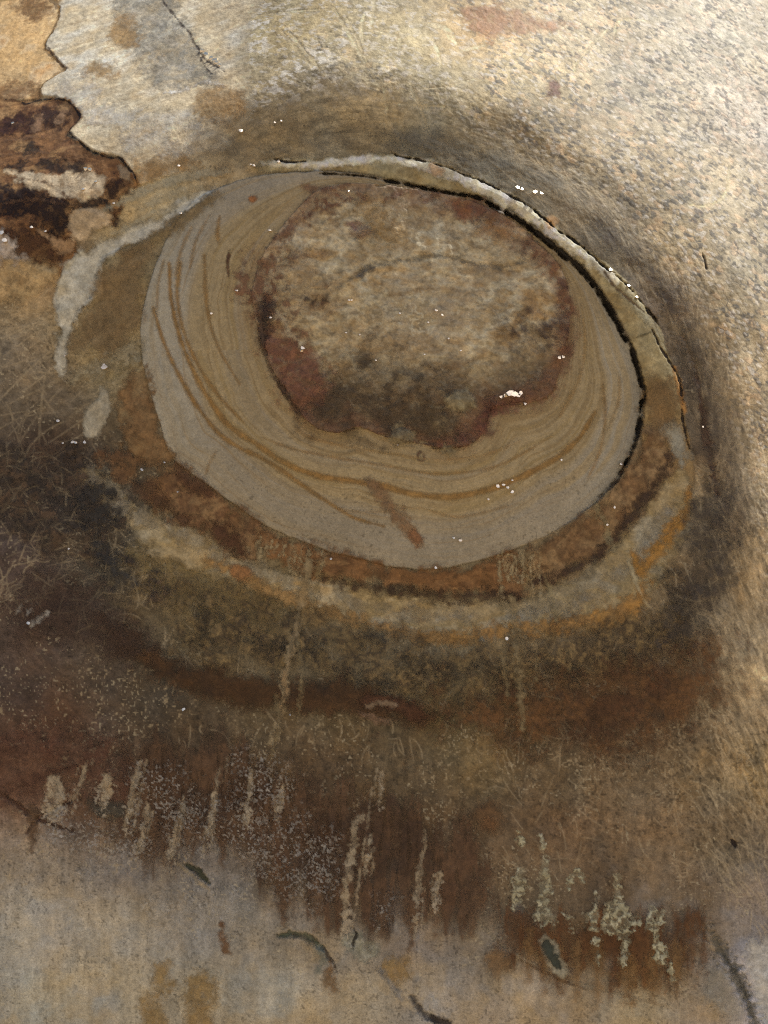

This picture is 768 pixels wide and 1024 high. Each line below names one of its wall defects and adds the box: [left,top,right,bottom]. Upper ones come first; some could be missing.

crack [163,2,218,74]
spalling [0,97,213,444]
leakage [0,441,745,762]
corrosion [153,262,596,547]
corrosion [94,366,691,646]
crack [275,154,719,498]
leakage [0,725,706,1004]